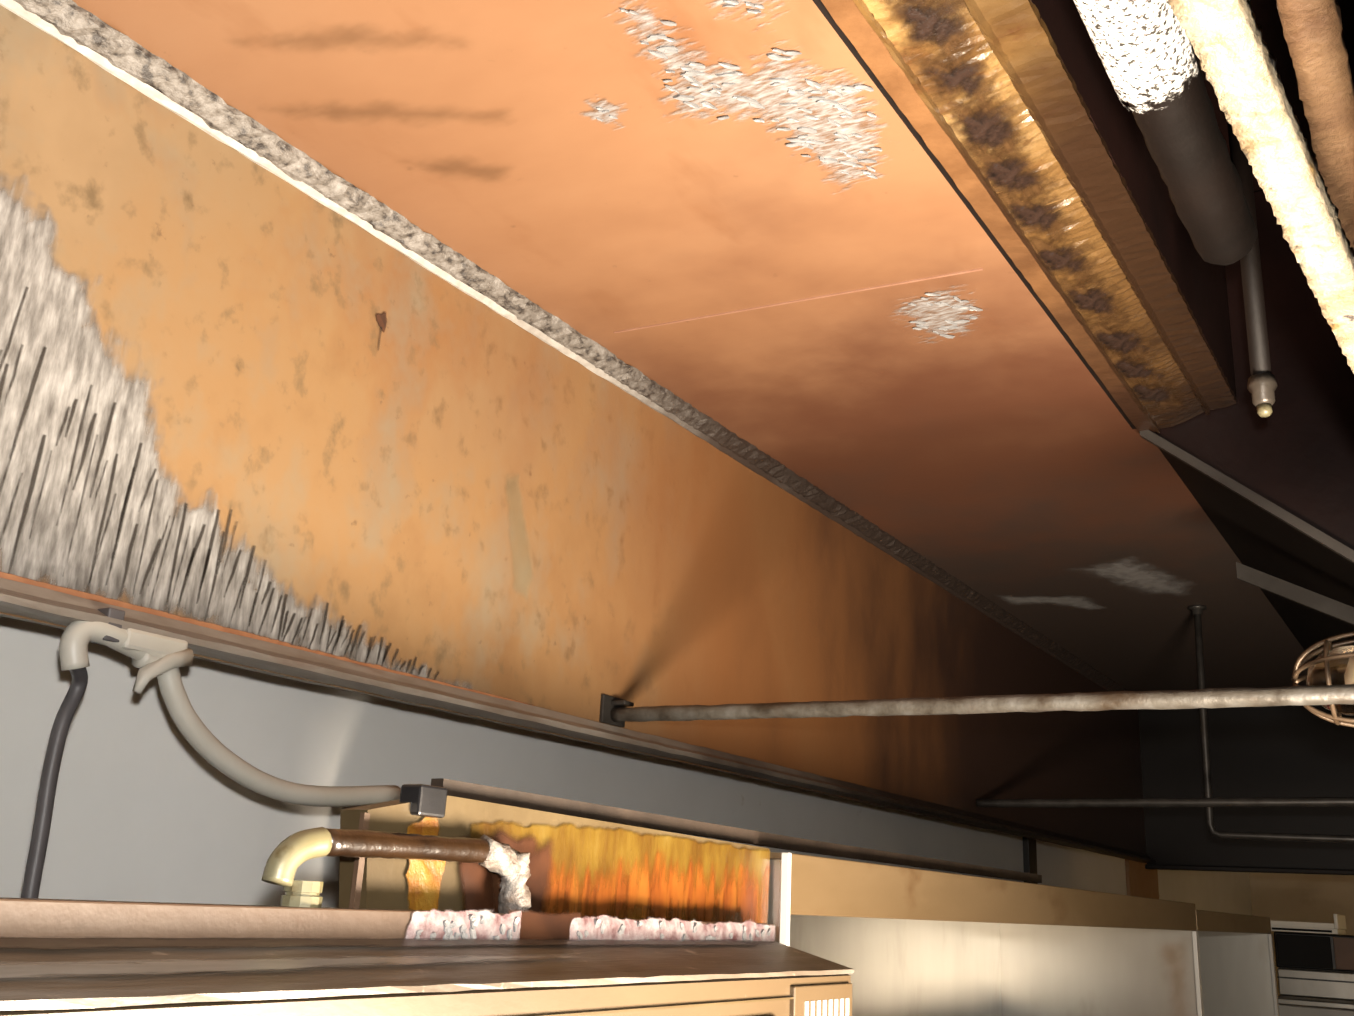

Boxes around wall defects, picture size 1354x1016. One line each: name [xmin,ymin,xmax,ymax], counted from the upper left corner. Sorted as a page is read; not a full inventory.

peeling [0,188,439,679]